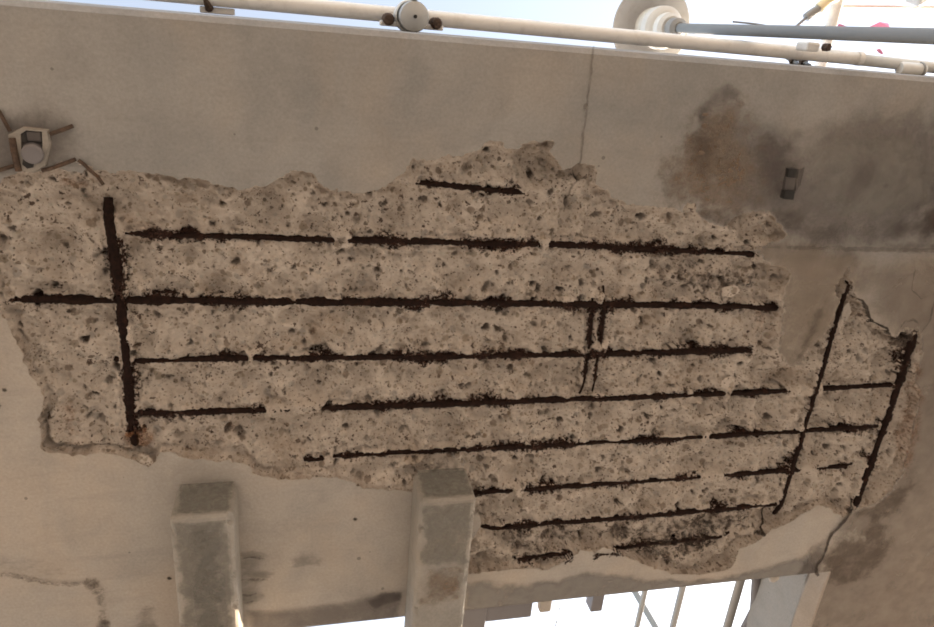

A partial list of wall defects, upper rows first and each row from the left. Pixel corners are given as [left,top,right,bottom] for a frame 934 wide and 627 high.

corrosion [659,265,756,287]
spalling [0,140,923,575]
corrosion [890,331,914,348]
corrosion [509,513,748,560]
crack [815,498,853,577]